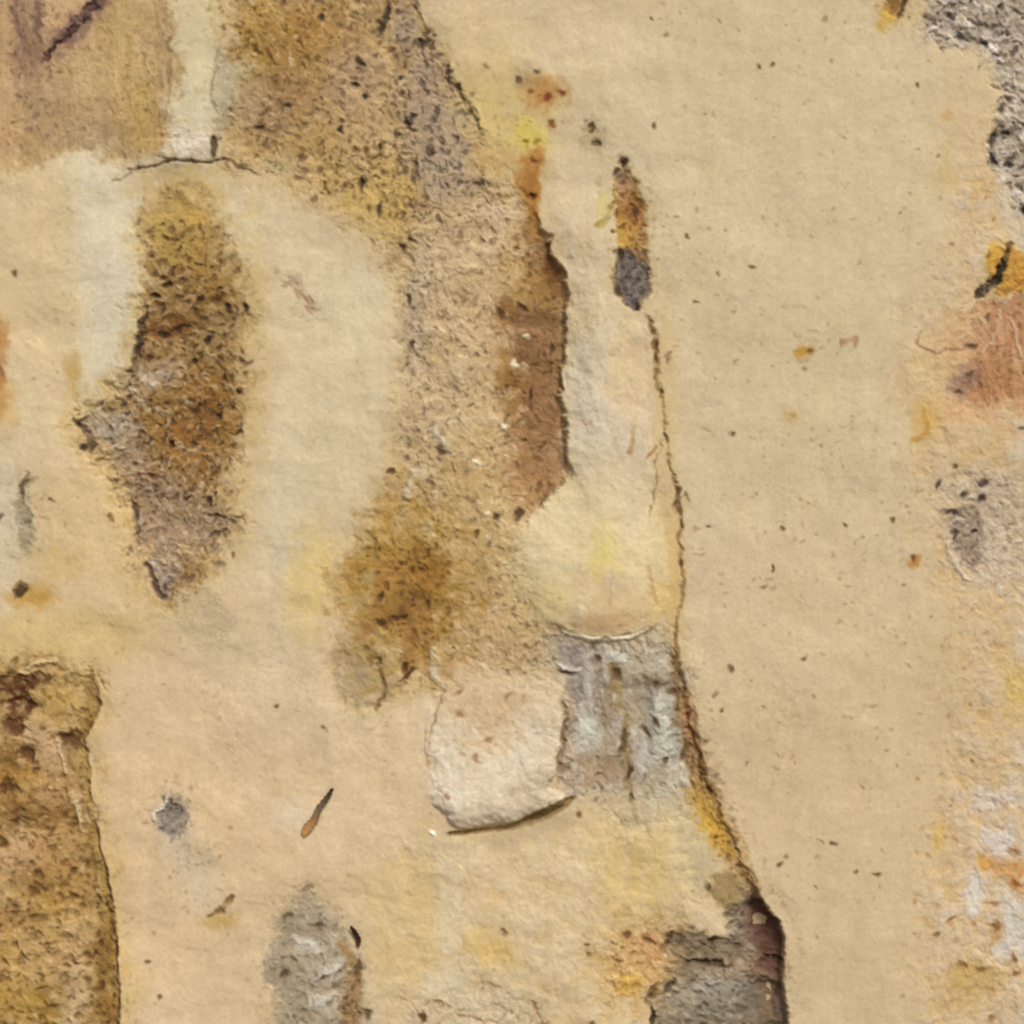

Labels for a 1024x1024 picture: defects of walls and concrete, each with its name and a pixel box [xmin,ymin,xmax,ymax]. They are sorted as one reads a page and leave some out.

crack [112,155,262,183]
rust [450,48,577,217]
spalling [919,0,1024,249]
spalling [0,0,791,1024]
crack [647,315,791,1021]